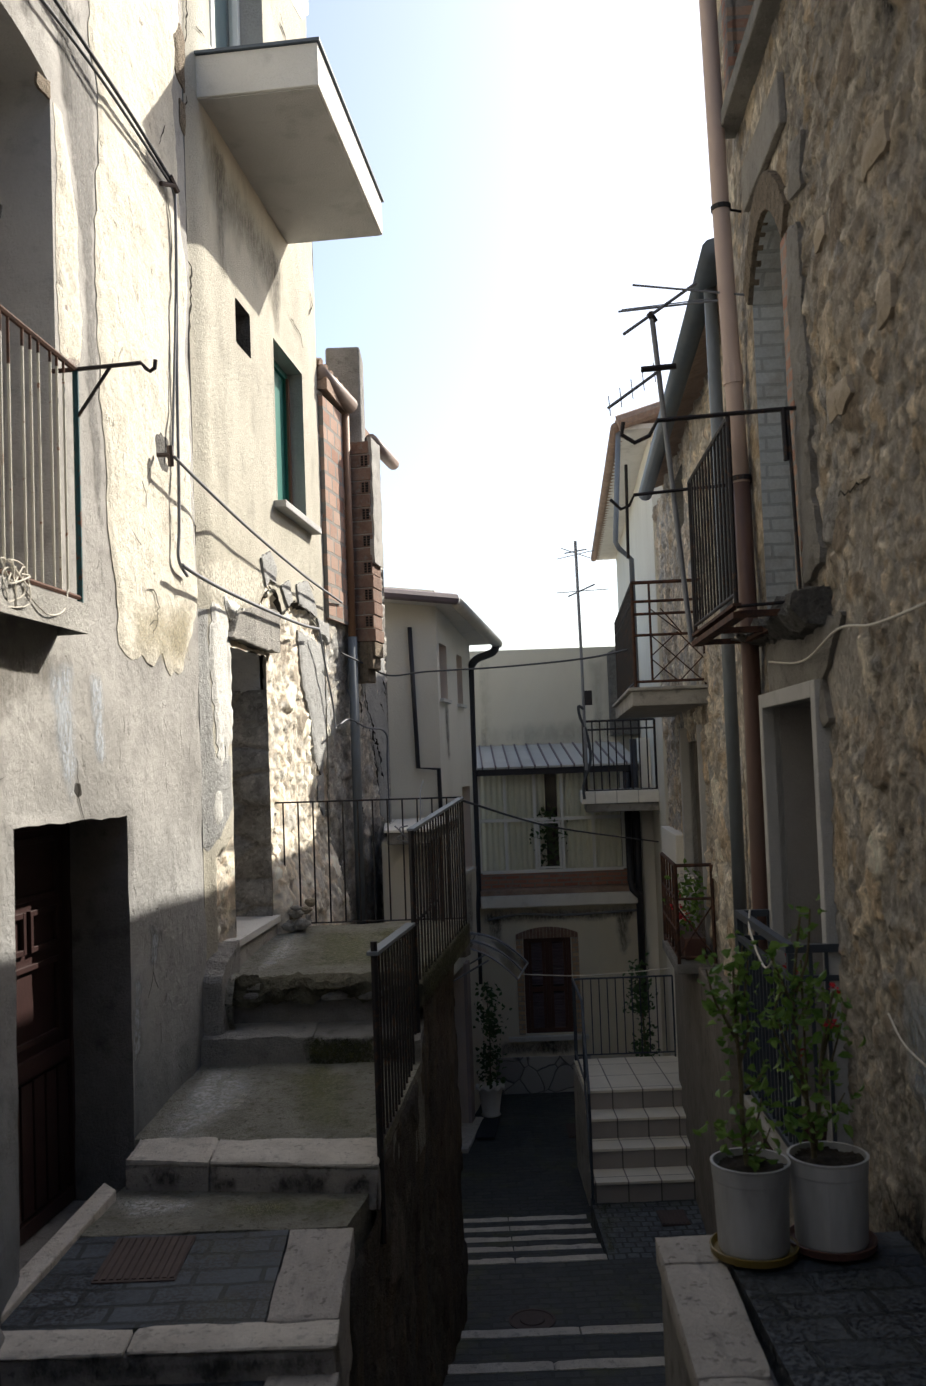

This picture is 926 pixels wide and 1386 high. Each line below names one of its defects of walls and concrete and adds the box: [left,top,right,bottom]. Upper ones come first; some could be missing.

crack [185,0,204,42]
flaking render [34,0,390,851]